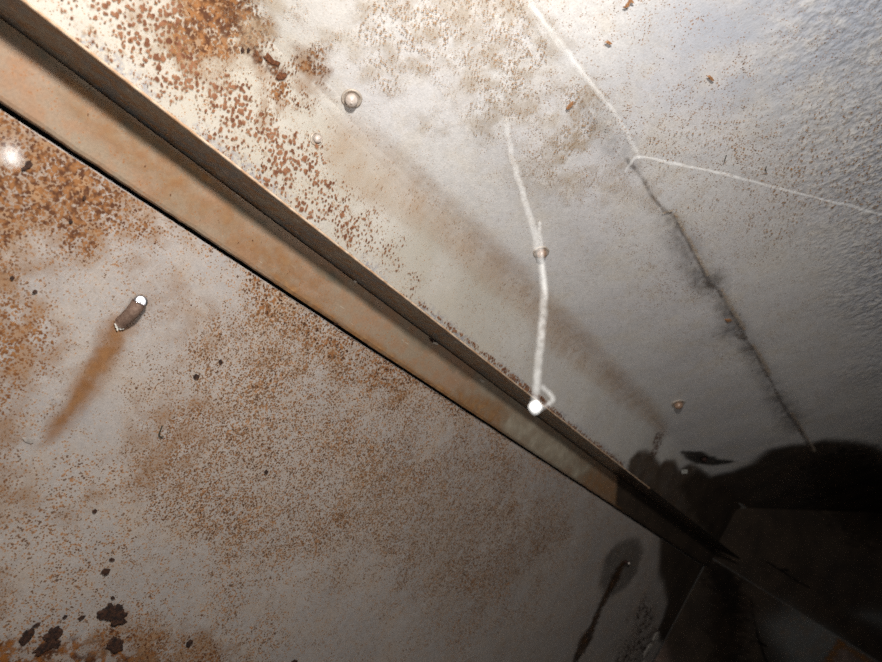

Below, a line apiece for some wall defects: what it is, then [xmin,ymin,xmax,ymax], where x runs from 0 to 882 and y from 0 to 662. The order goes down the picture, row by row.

corrosion [0,106,573,662]
corrosion [75,0,632,467]
leakage [575,561,625,661]
corrosion [677,61,882,269]